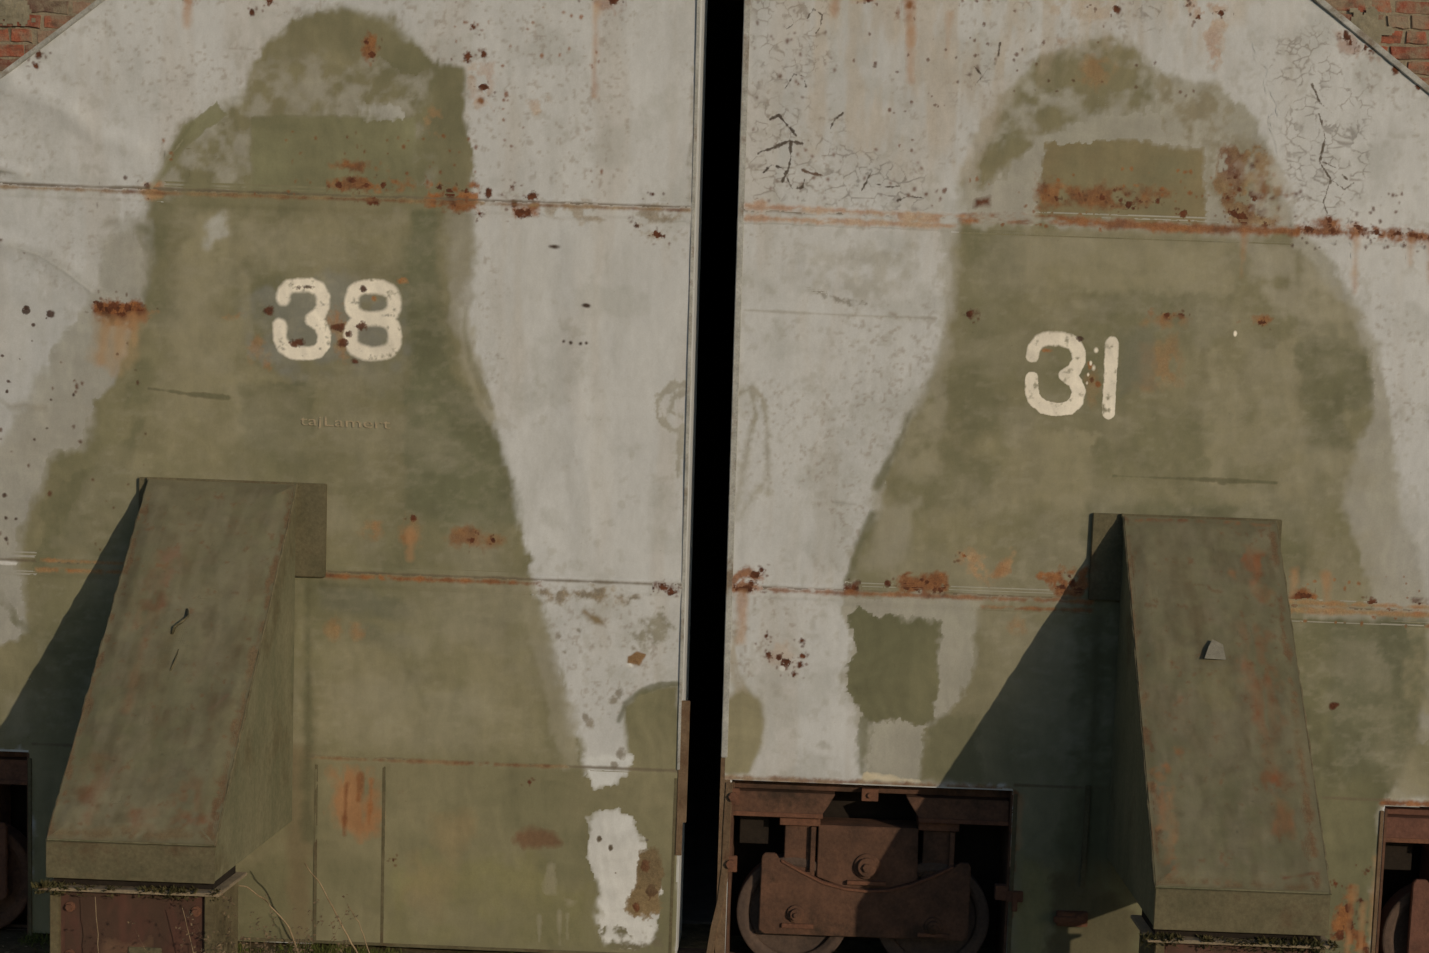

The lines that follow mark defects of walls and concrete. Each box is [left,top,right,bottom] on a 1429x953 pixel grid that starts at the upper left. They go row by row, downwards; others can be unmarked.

peeling [0,0,36,26]
crack [743,0,937,220]
rust [743,0,1429,297]
spalling [1368,191,1404,225]
rust [84,292,159,380]
rust [1082,361,1103,412]
rust [441,522,511,555]
rust [732,562,1094,680]
rust [1288,564,1429,619]
rust [323,761,405,845]
rust [1378,798,1429,807]
peeling [599,839,665,953]